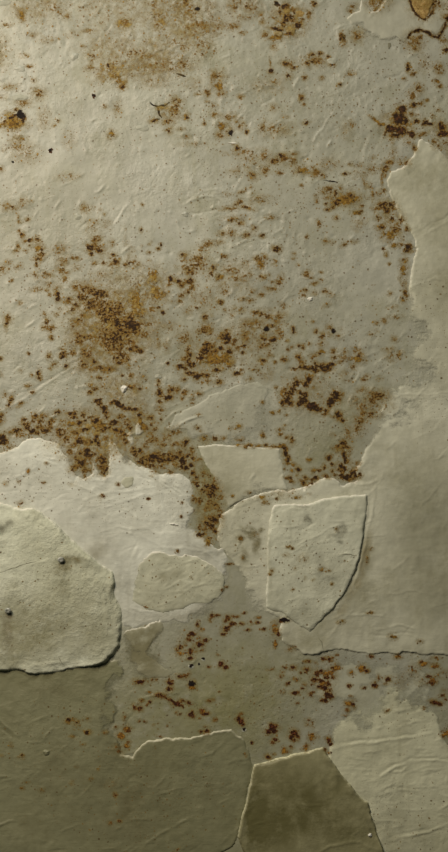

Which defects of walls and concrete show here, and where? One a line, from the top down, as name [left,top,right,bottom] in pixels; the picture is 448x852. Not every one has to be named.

corrosion [0,0,335,139]
corrosion [0,79,448,547]
peeling [127,423,144,445]
corrosion [175,611,290,662]
corrosion [114,673,219,753]
corrosion [262,719,316,754]
corrosion [268,654,447,716]